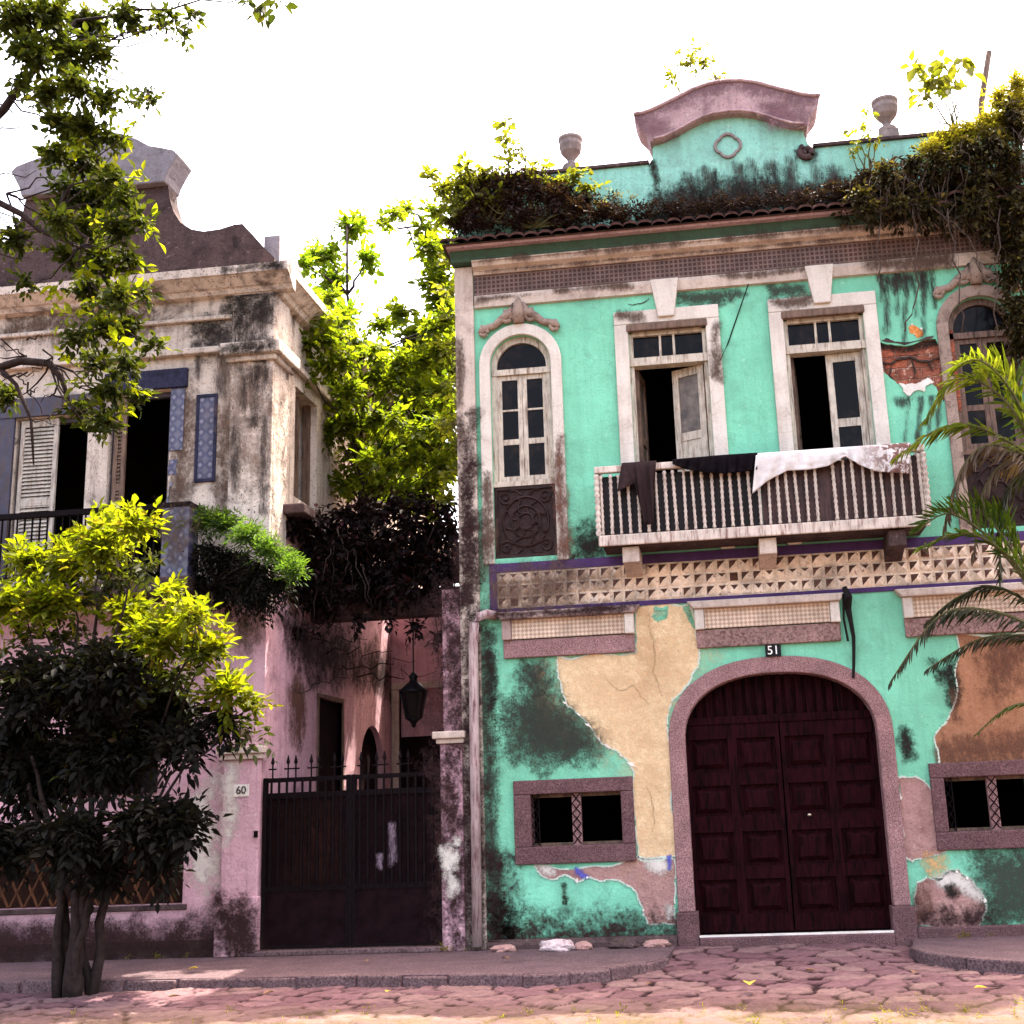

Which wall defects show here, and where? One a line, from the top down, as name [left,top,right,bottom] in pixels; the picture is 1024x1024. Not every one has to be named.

damp [643,149,850,225]
damp [879,271,937,344]
spalling [880,323,962,411]
damp [211,299,284,514]
damp [423,341,678,951]
peeling [933,631,1024,763]
peeling [534,604,701,926]
damp [896,726,917,760]
damp [0,918,55,963]
damp [85,891,262,961]
spalling [913,869,996,927]